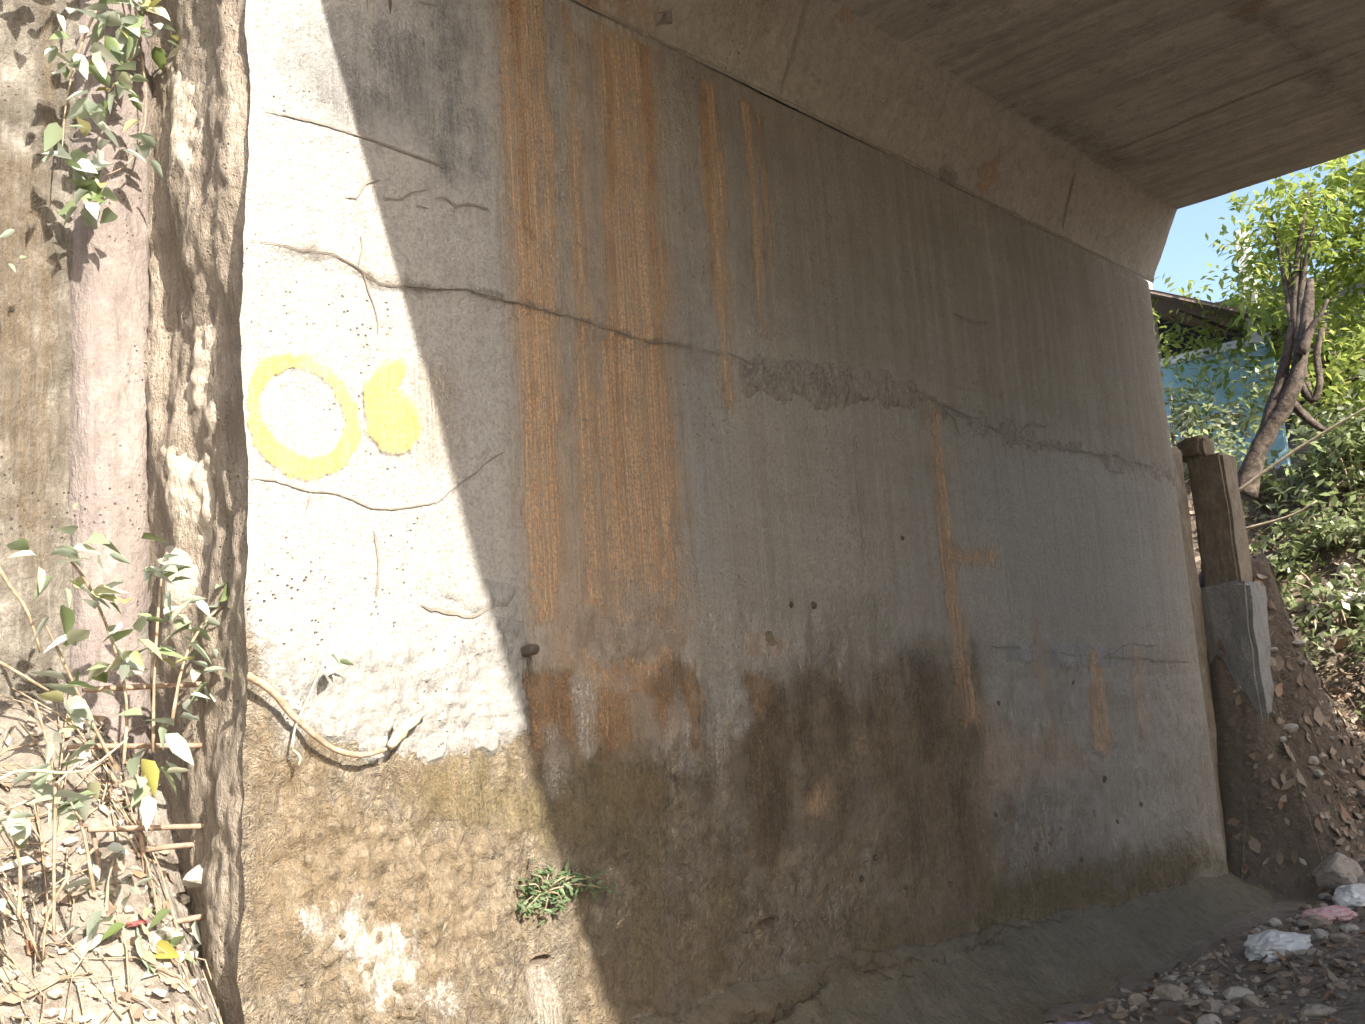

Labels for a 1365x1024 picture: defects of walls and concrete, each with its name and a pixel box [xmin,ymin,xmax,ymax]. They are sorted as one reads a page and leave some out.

crack [264,109,489,209]
crack [253,236,761,365]
crack [916,391,1170,474]
damp [422,681,664,846]
damp [300,895,457,1013]
damp [528,966,560,1024]